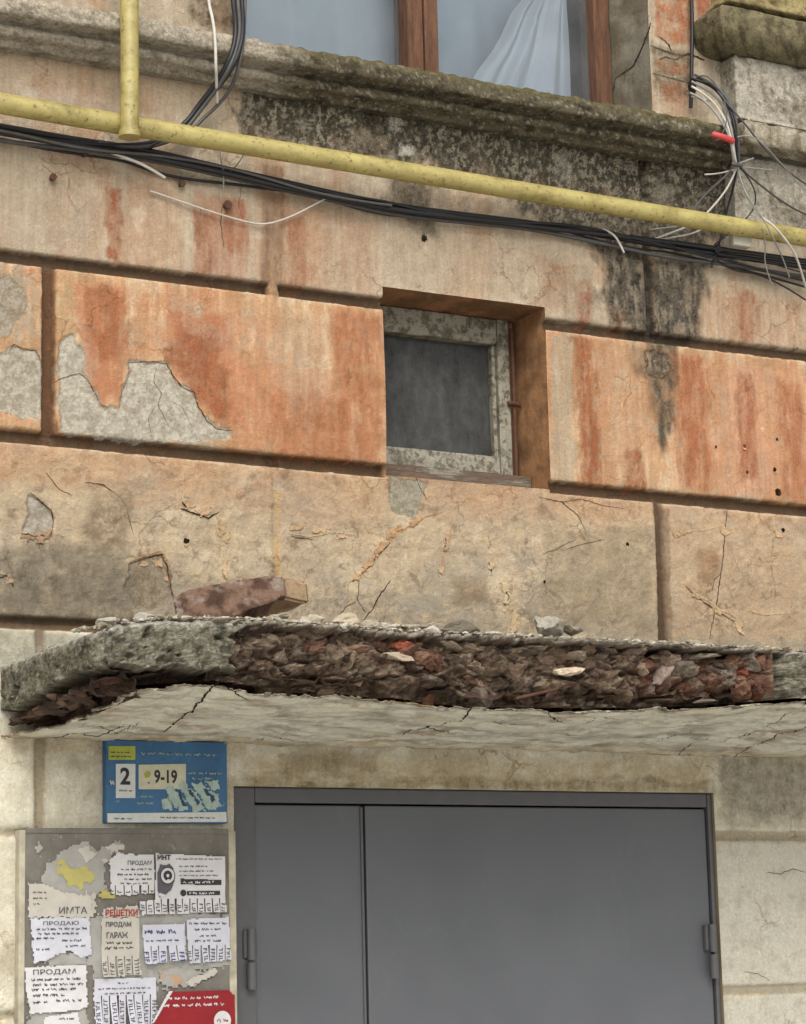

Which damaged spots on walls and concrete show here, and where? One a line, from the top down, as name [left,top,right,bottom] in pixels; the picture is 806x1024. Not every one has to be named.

crack [613,23,704,91]
leakage [233,91,726,215]
peeling [0,275,231,446]
rust [576,297,598,481]
leakage [517,200,727,446]
flaking render [20,492,54,544]
crack [340,580,391,621]
flaking render [349,476,453,582]
spalling [124,496,785,716]
crack [710,514,727,636]
spalling [9,683,108,724]
crack [164,674,247,732]